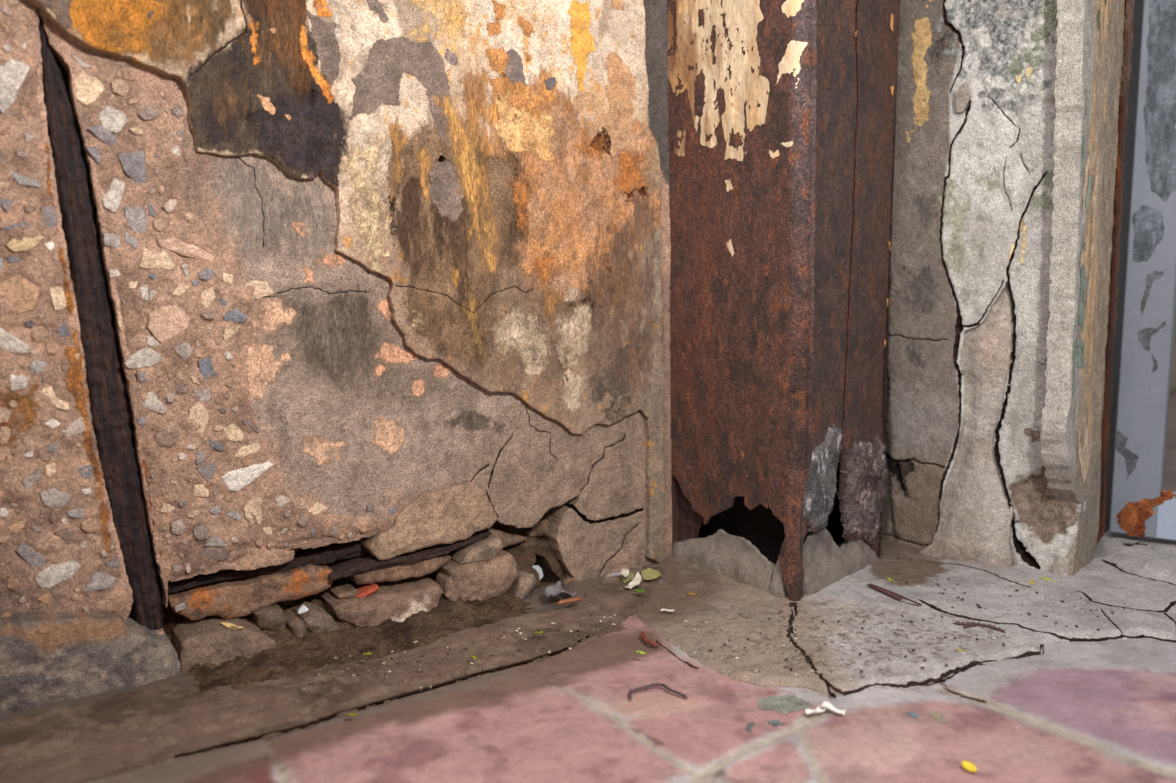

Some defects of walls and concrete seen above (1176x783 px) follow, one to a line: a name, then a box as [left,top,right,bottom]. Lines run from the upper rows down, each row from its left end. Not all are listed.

rust [69,0,234,64]
rust [313,0,332,17]
damp [185,0,663,422]
rust [406,0,662,322]
peeling [1132,0,1176,315]
spalling [0,0,665,636]
crack [884,0,1048,587]
crack [471,405,558,518]
crack [568,435,644,577]
spalling [1008,465,1079,543]
rust [1116,489,1176,538]
crack [786,559,1176,703]